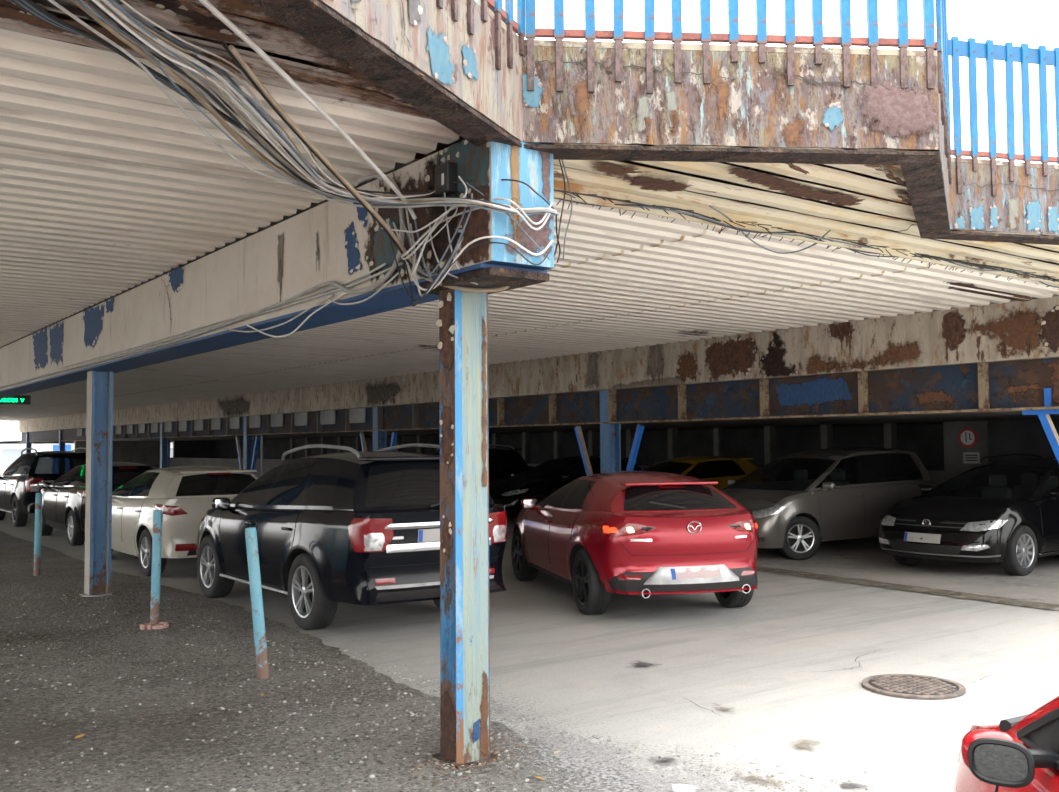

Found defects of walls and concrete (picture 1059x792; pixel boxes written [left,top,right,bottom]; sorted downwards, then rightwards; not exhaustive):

peeling [408,0,478,86]
peeling [345,139,490,285]
rust [592,163,693,192]
rust [728,168,864,206]
peeling [954,205,999,230]
peeling [32,322,64,369]
peeling [83,297,114,348]
rust [805,322,922,374]
rust [942,295,1059,404]
peeling [440,406,454,464]
rust [440,691,456,762]
rust [480,672,489,758]